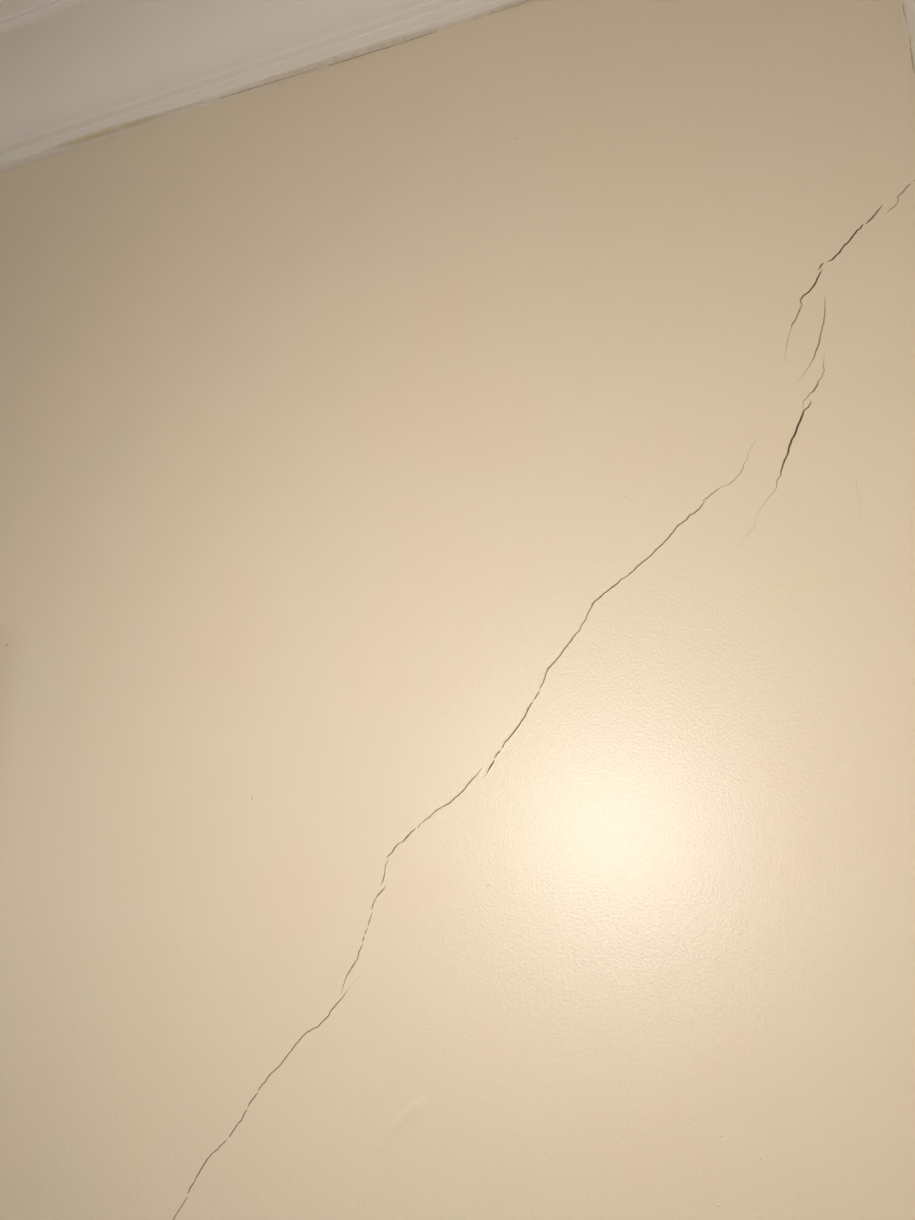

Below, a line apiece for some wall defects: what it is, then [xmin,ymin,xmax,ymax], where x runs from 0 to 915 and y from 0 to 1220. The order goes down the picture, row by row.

crack [738,179,915,548]
crack [171,436,759,1220]